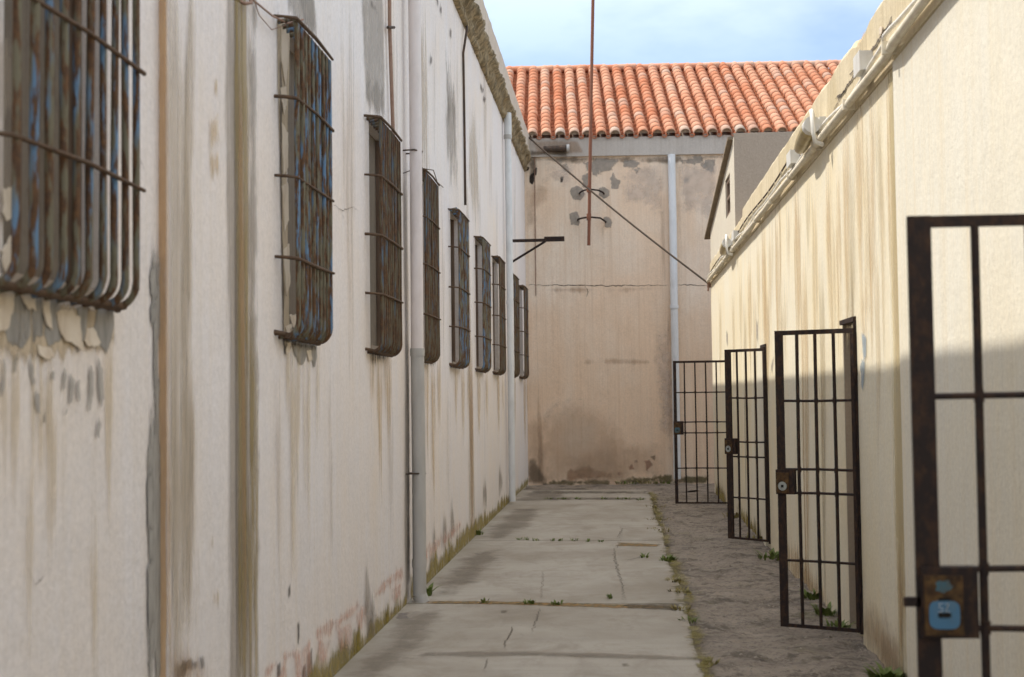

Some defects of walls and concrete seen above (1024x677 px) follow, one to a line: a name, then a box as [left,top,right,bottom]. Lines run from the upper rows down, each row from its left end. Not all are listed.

flaking render [586,158,640,175]
flaking render [0,291,115,438]
water stain [530,462,543,482]
water stain [176,657,205,677]